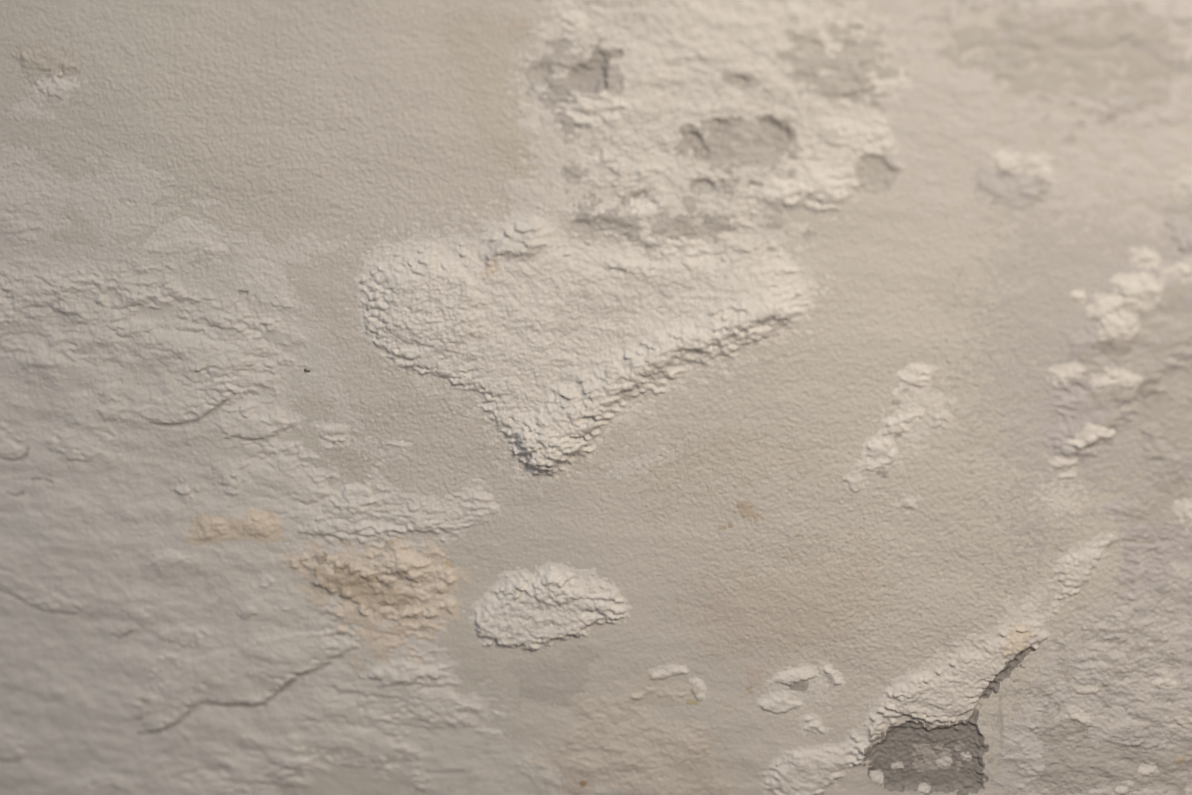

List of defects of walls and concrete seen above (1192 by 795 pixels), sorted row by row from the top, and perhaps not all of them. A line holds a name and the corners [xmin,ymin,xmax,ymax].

damp [0,260,751,795]
damp [341,0,1192,795]
flaking render [863,572,1192,795]